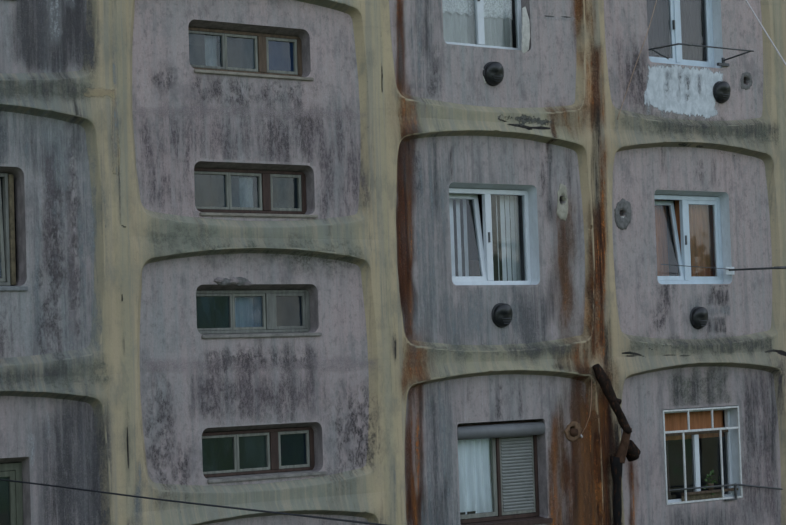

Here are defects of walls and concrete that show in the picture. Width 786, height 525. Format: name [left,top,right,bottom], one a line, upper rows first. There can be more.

spalling [498,115,553,126]
peeling [644,64,723,119]
corrosion [396,0,427,525]
corrosion [549,45,622,525]
leakage [42,409,109,525]